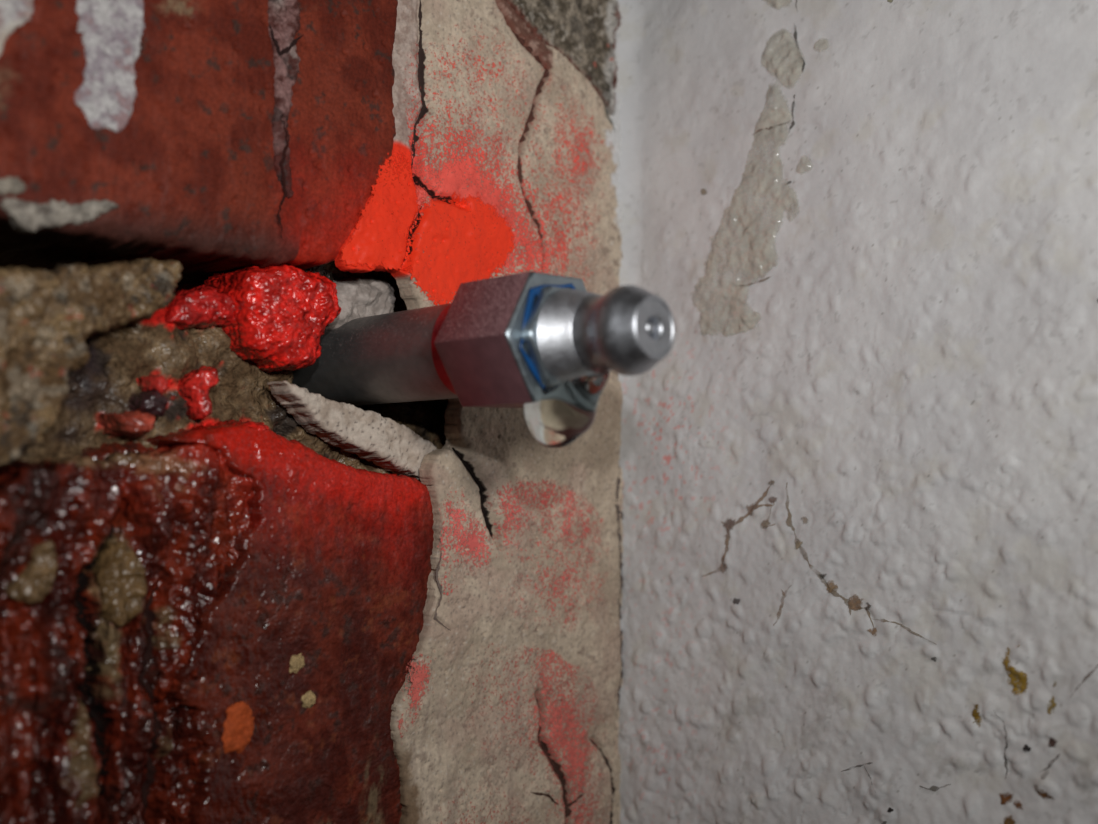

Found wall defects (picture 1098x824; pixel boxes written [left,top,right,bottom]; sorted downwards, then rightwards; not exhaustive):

peeling [0,0,34,55]
peeling [0,176,120,234]
peeling [74,0,145,133]
crack [402,0,460,265]
crack [511,30,549,256]
crack [452,447,493,539]
crack [590,466,623,824]
crack [531,698,583,817]